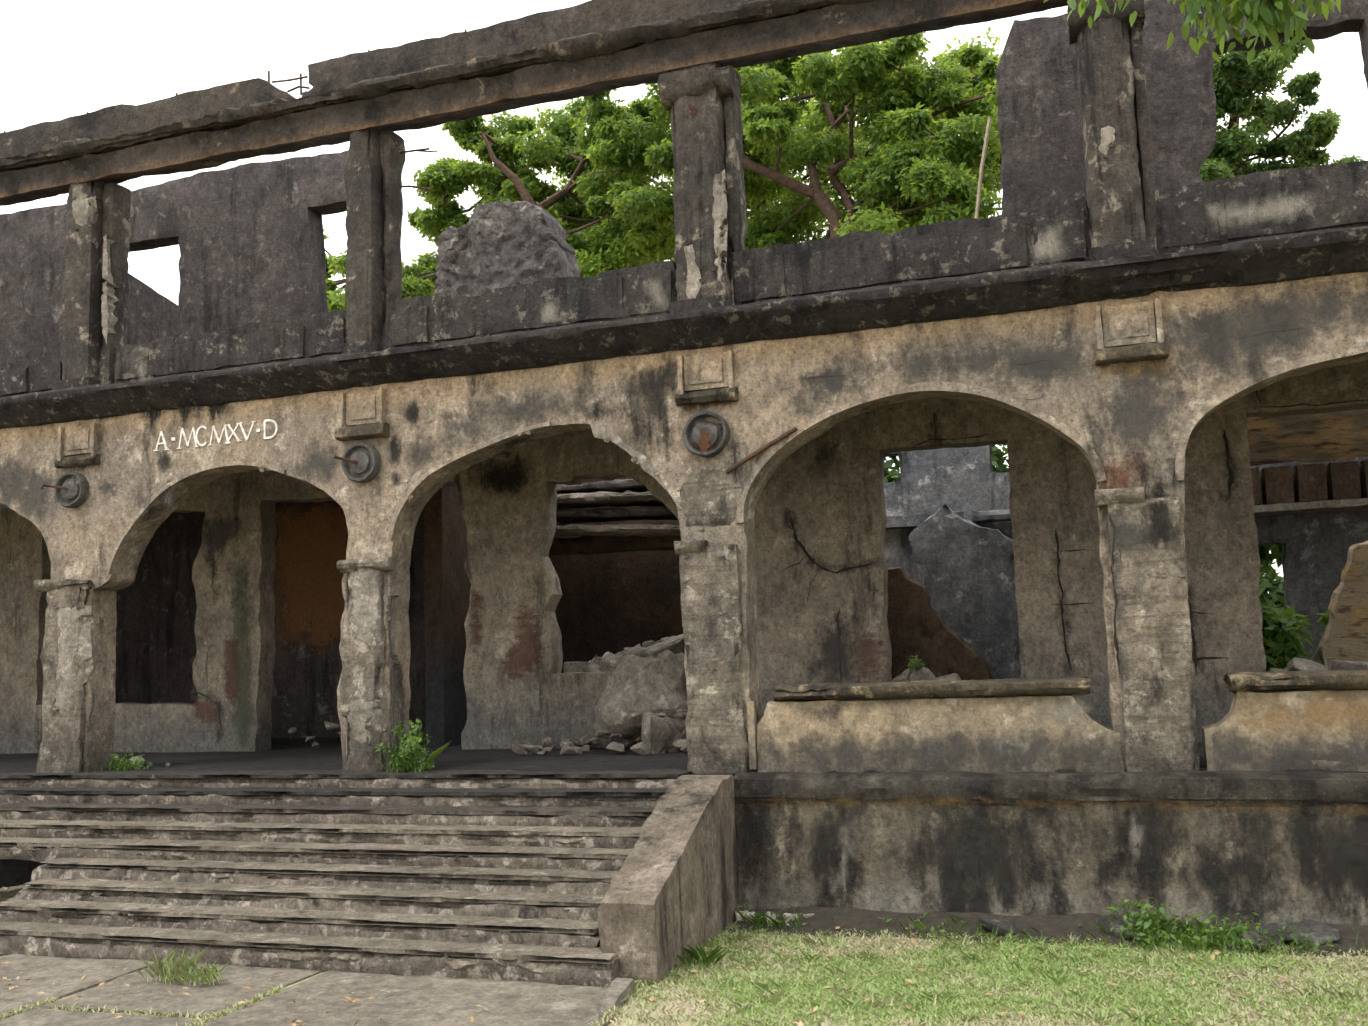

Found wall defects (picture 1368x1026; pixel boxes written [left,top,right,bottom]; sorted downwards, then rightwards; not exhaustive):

flaking render [683,169,728,299]
water stain [0,460,52,518]
water stain [202,518,239,561]
water stain [478,458,528,494]
water stain [389,358,677,484]
crack [1223,430,1237,502]
crack [782,510,878,681]
crack [1052,514,1126,680]
crack [1188,589,1238,675]
water stain [911,799,1032,912]
water stain [1124,802,1173,907]
water stain [1291,805,1368,915]